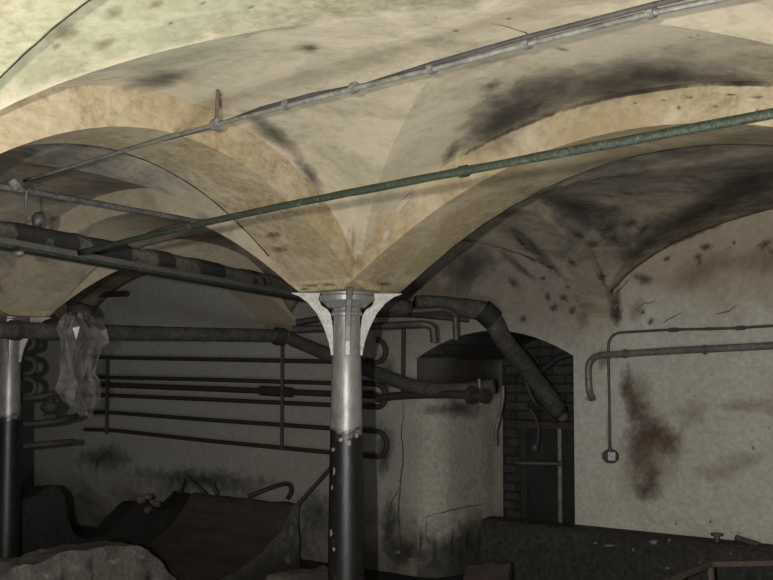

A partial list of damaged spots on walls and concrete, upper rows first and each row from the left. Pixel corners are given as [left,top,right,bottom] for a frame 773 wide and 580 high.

crack [388,403,404,567]
crack [425,504,481,545]